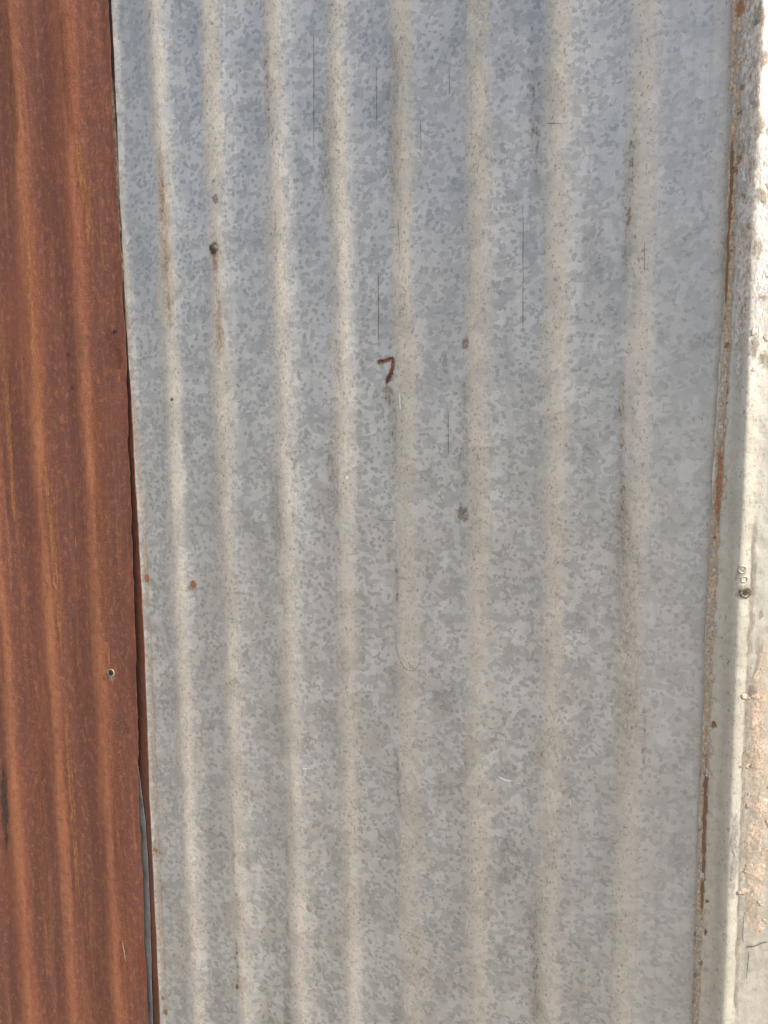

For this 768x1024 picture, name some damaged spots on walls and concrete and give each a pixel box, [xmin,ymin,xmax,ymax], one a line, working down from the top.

corrosion [2,337,16,521]
corrosion [117,371,141,478]
corrosion [378,356,395,399]
corrosion [692,0,751,1024]